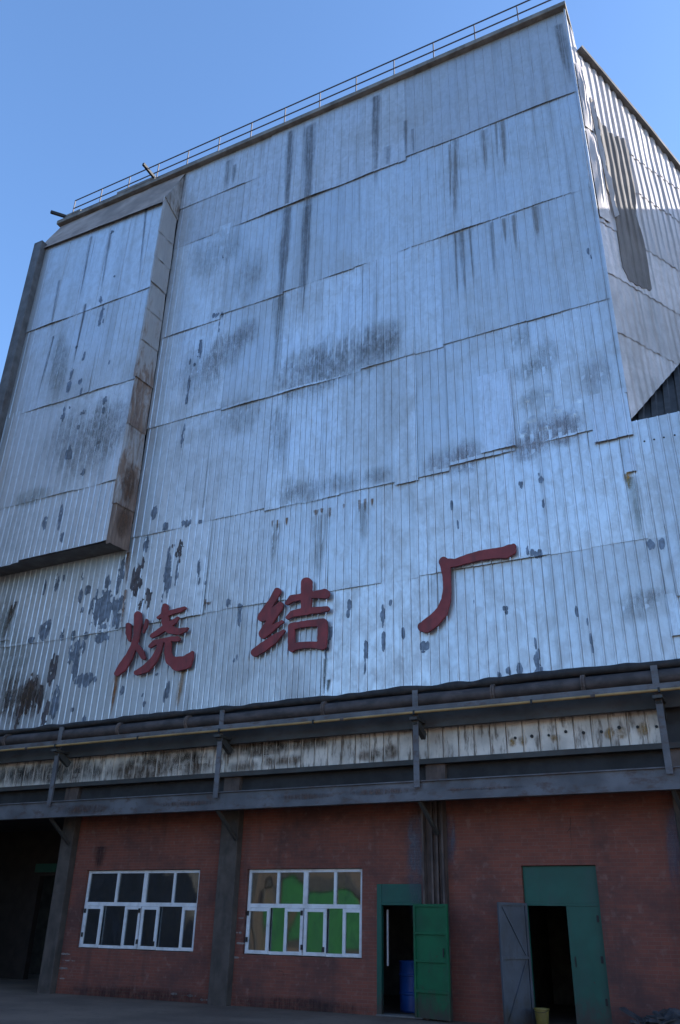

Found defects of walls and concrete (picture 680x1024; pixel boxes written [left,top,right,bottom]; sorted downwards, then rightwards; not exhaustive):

leakage [280,132,292,300]
leakage [303,125,313,291]
peeling [2,519,202,729]